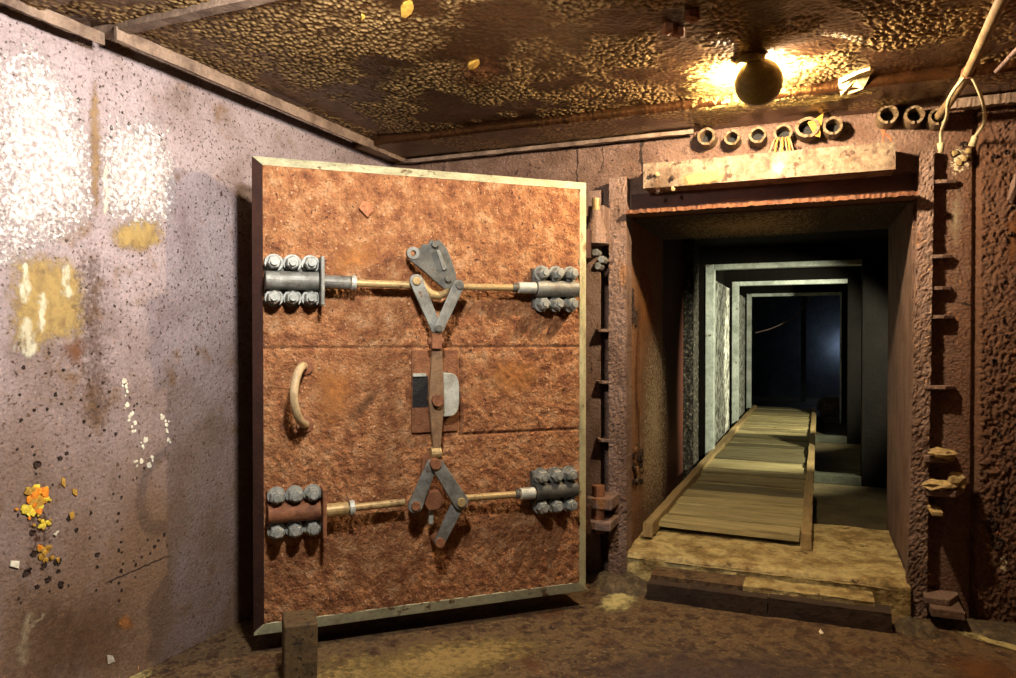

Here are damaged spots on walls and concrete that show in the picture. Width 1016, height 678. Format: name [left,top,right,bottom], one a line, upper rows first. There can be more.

peeling [0,42,175,282]
peeling [9,445,77,592]